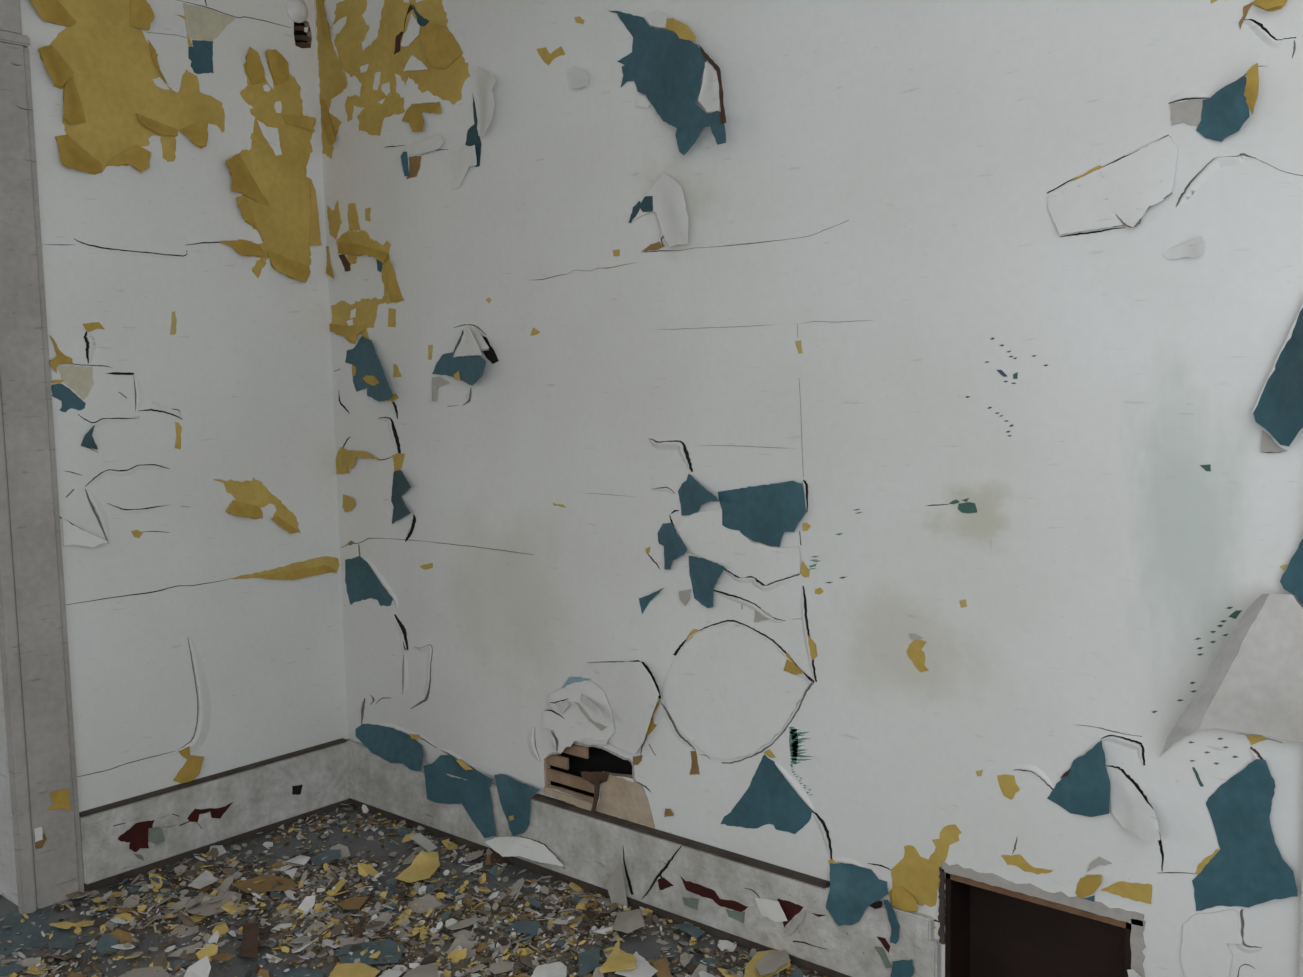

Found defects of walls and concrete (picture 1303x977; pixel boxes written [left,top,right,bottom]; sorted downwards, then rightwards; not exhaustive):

peeling [608,10,726,155]
peeling [1239,0,1287,29]
peeling [29,0,496,419]
crack [1047,135,1168,194]
crack [1060,153,1303,237]
crack [60,404,185,543]
peeling [645,438,824,623]
peeling [639,588,663,614]
peeling [361,722,490,778]
spalling [544,742,673,829]
crack [661,586,817,775]
peeling [1192,733,1297,911]